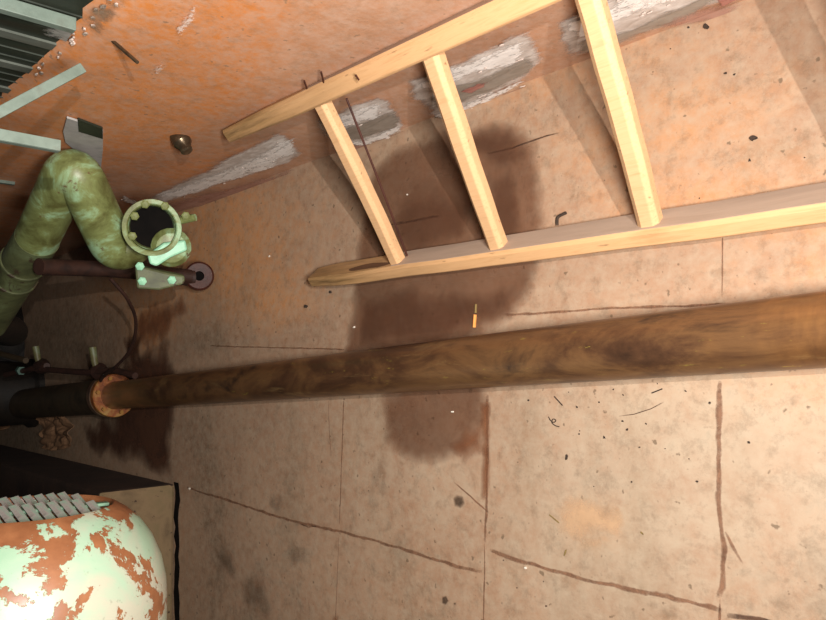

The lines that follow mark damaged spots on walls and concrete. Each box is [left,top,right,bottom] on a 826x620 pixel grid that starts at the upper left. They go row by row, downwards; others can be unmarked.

spalling [47,0,118,46]
peeling [150,135,301,211]
leakage [361,217,386,260]
leakage [374,141,485,252]
leakage [473,132,554,235]
leakage [352,261,531,348]
leakage [388,389,478,453]
crack [190,384,768,620]